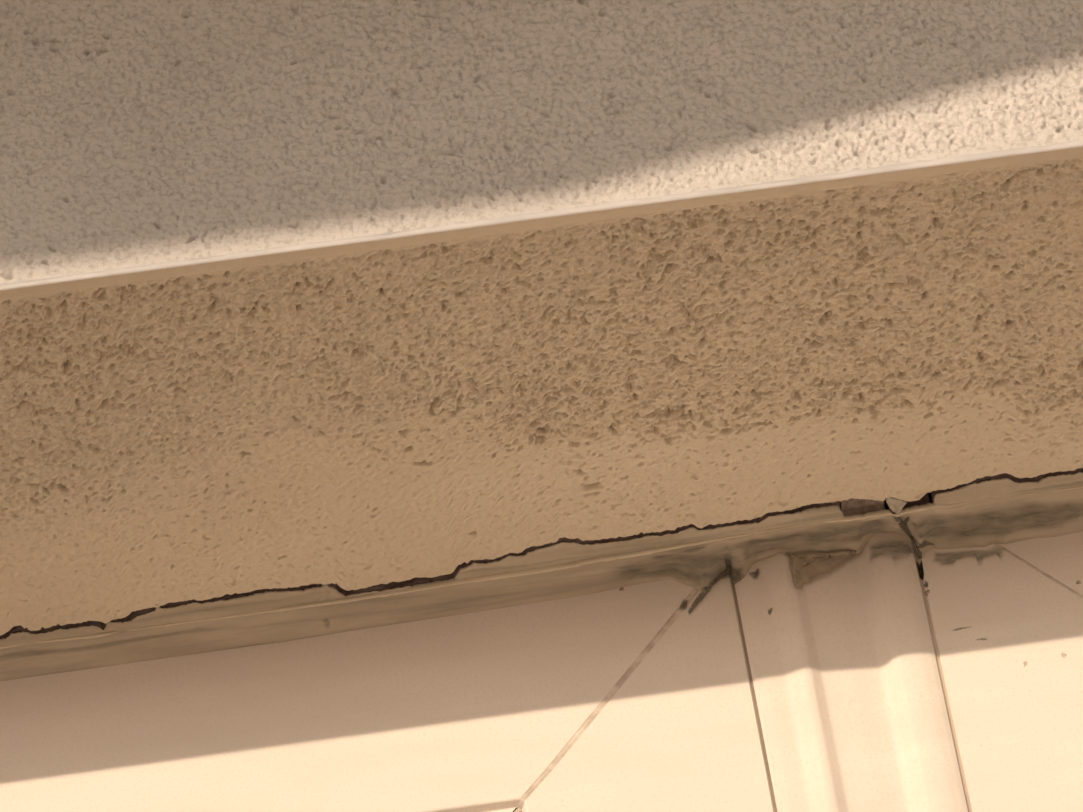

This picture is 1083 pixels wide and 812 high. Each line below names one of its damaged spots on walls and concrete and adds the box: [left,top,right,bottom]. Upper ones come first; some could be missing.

flaking render [841,493,930,516]
crack [0,501,840,639]
water stain [746,521,911,558]
water stain [936,551,1000,564]